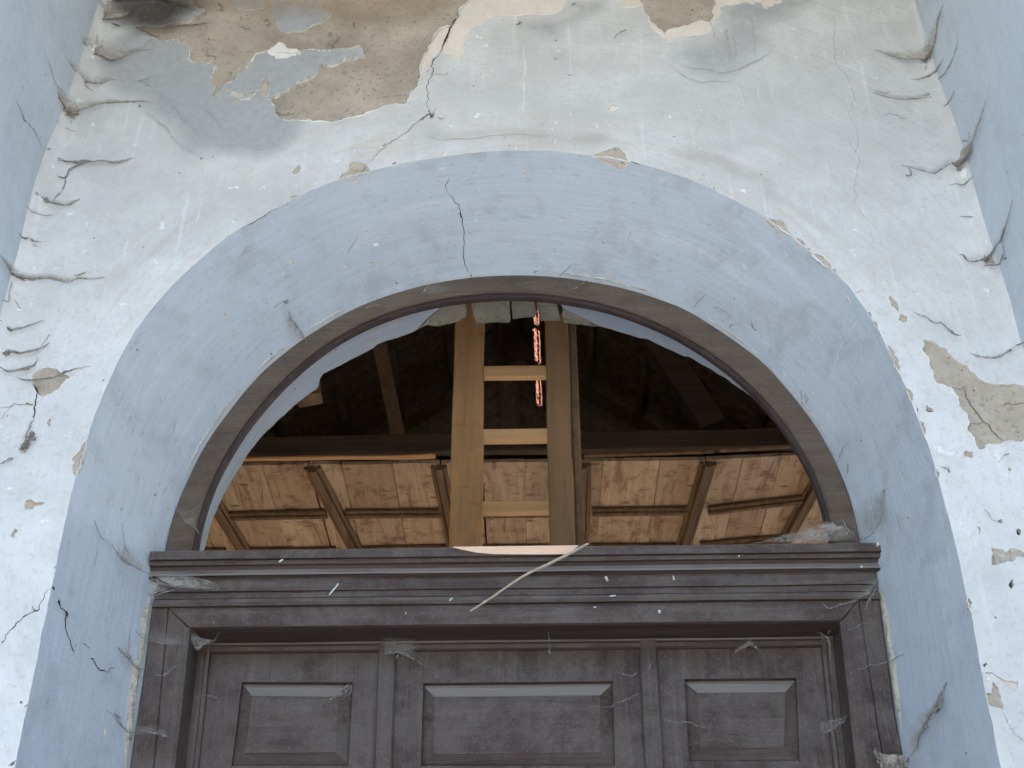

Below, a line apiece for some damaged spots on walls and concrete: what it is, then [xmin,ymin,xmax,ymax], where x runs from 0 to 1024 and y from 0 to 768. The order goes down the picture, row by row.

spalling [618,0,783,43]
spalling [136,0,567,123]
crack [368,13,459,163]
spalling [591,147,630,169]
crack [445,182,472,276]
crack [1,383,38,418]
spalling [25,367,73,407]
spalling [921,340,1024,459]
spalling [991,547,1024,566]
crack [1,586,114,673]
spalling [983,663,1018,711]